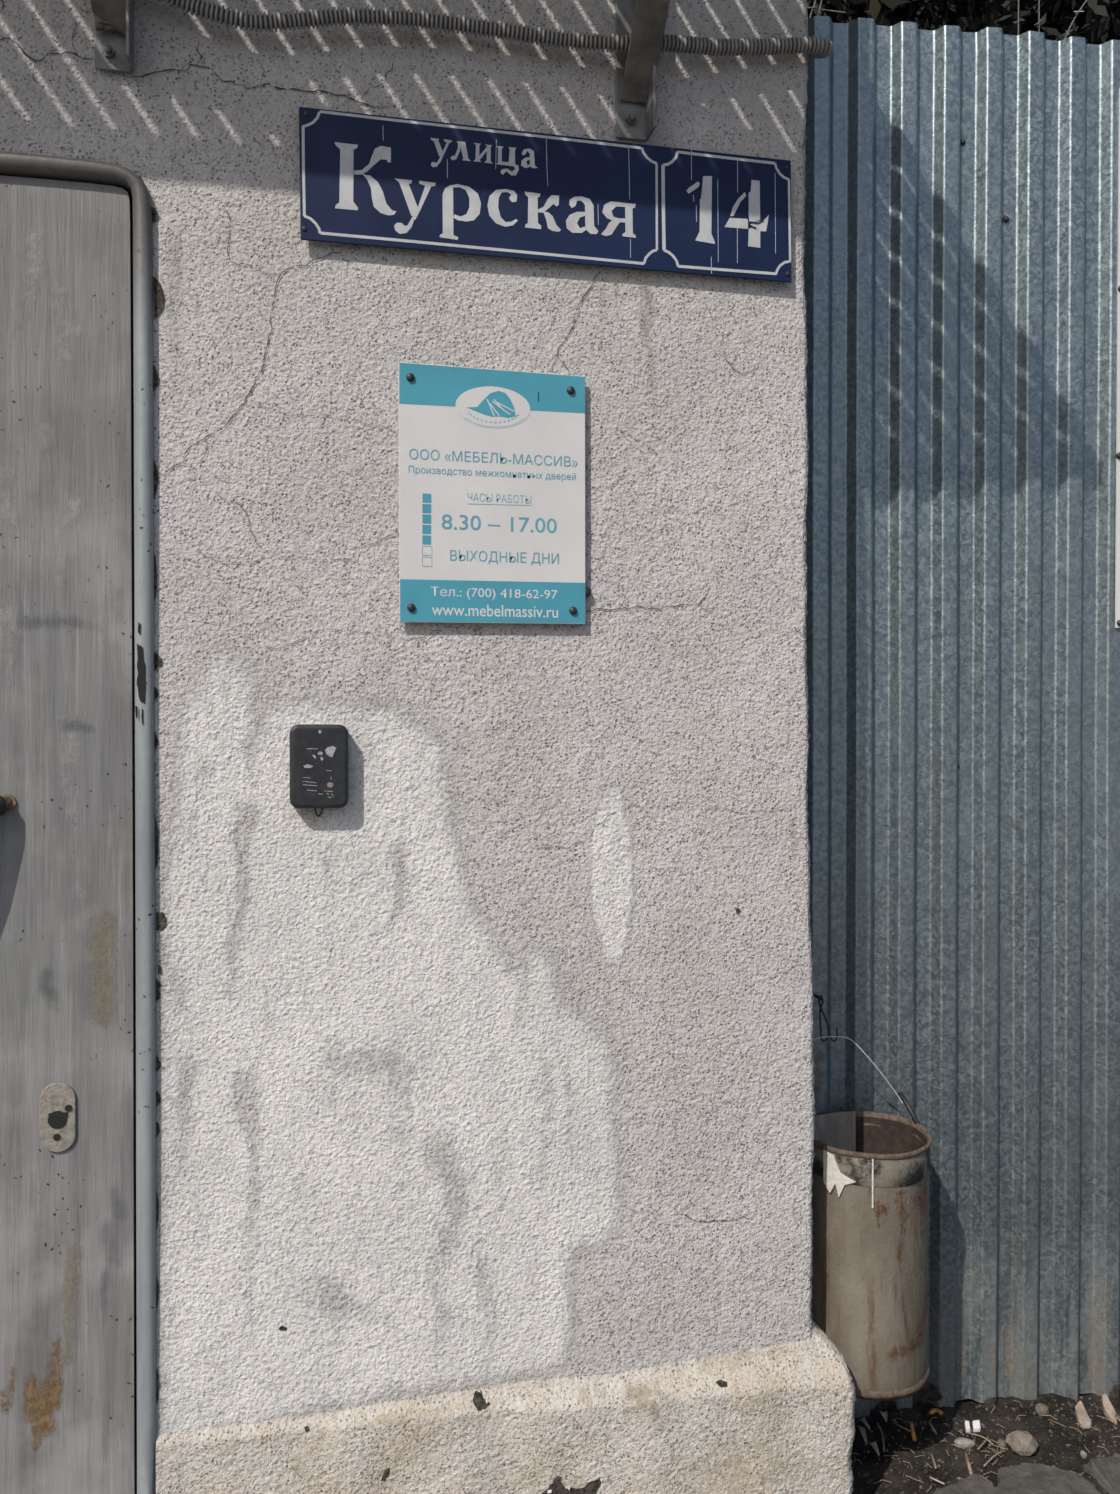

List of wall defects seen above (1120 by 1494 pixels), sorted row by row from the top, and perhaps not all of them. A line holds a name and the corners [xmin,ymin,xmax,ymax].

crack [0,0,95,86]
crack [133,41,469,109]
crack [158,208,398,585]
spalling [541,1476,603,1494]